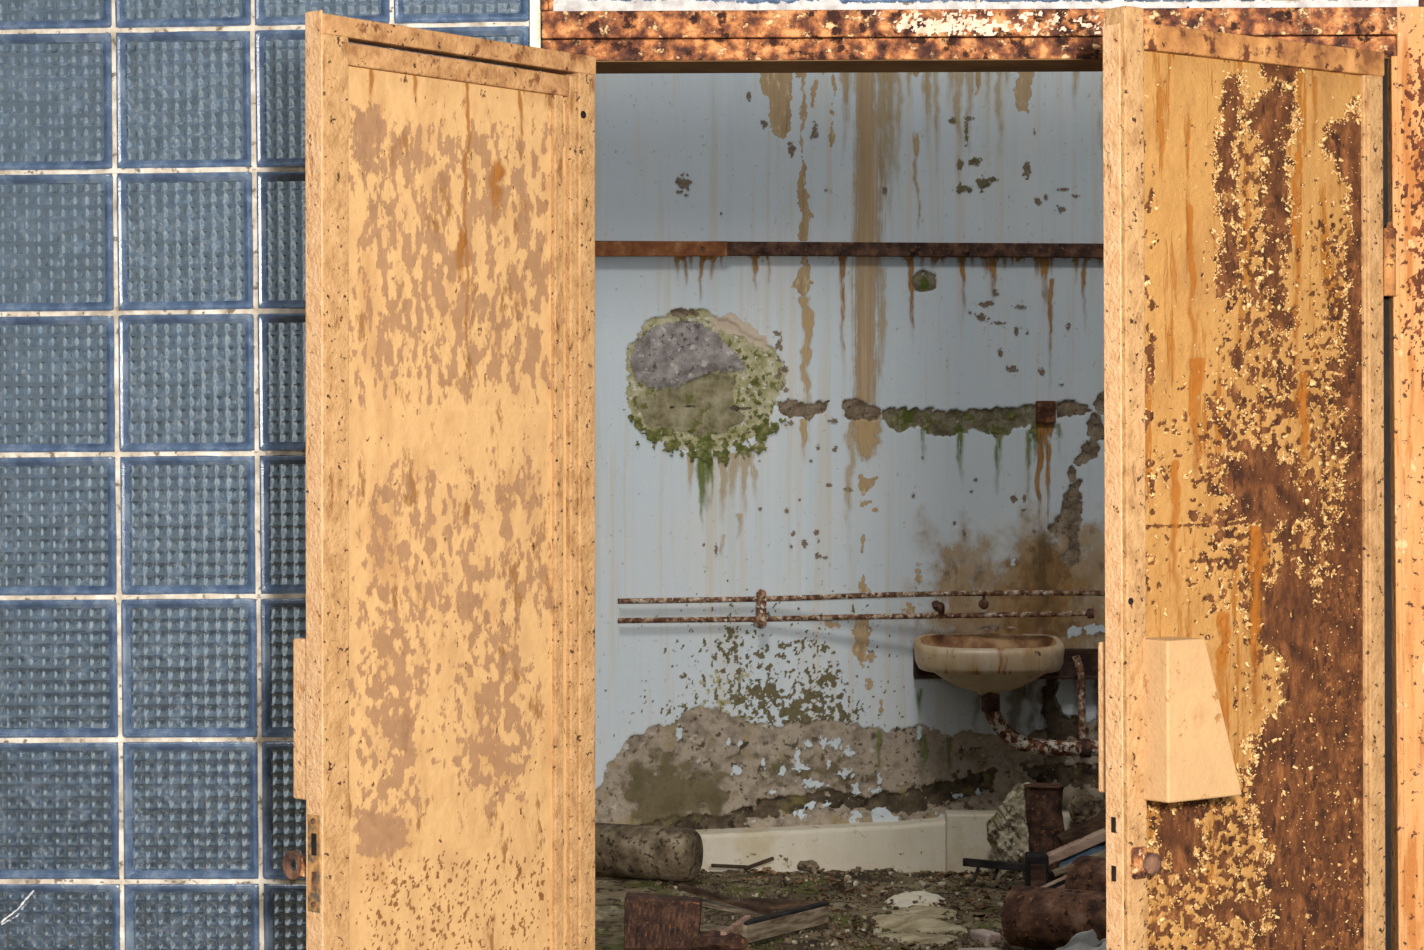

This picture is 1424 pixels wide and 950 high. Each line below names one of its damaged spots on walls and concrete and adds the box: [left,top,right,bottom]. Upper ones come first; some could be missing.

rust [458,83,471,296]
rust [493,163,504,204]
rust [1400,47,1424,396]
spalling [968,289,1030,336]
rust [1144,64,1364,950]
peeling [858,574,871,593]
peeling [901,563,922,614]
water stain [629,593,922,786]
spalling [595,619,1106,829]
water stain [622,748,729,826]
rust [356,847,553,950]